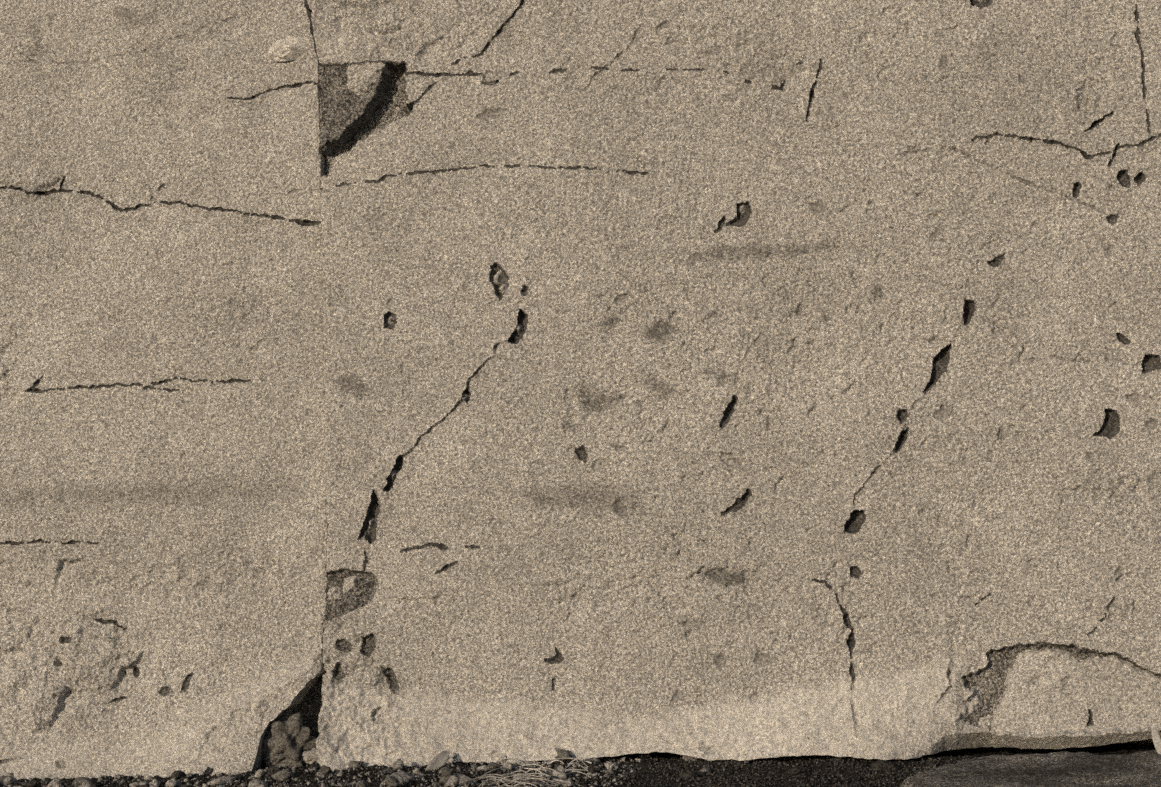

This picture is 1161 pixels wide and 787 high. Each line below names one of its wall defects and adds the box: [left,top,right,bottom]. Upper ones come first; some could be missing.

spalling [307,0,511,178]
crack [404,0,525,105]
crack [896,4,1161,215]
crack [0,164,648,226]
spalling [0,377,43,423]
crack [25,338,266,393]
crack [357,309,528,574]
crack [843,298,976,534]
spalling [53,557,85,592]
spalling [0,596,140,752]
spalling [149,568,409,778]
spalling [933,580,1161,749]